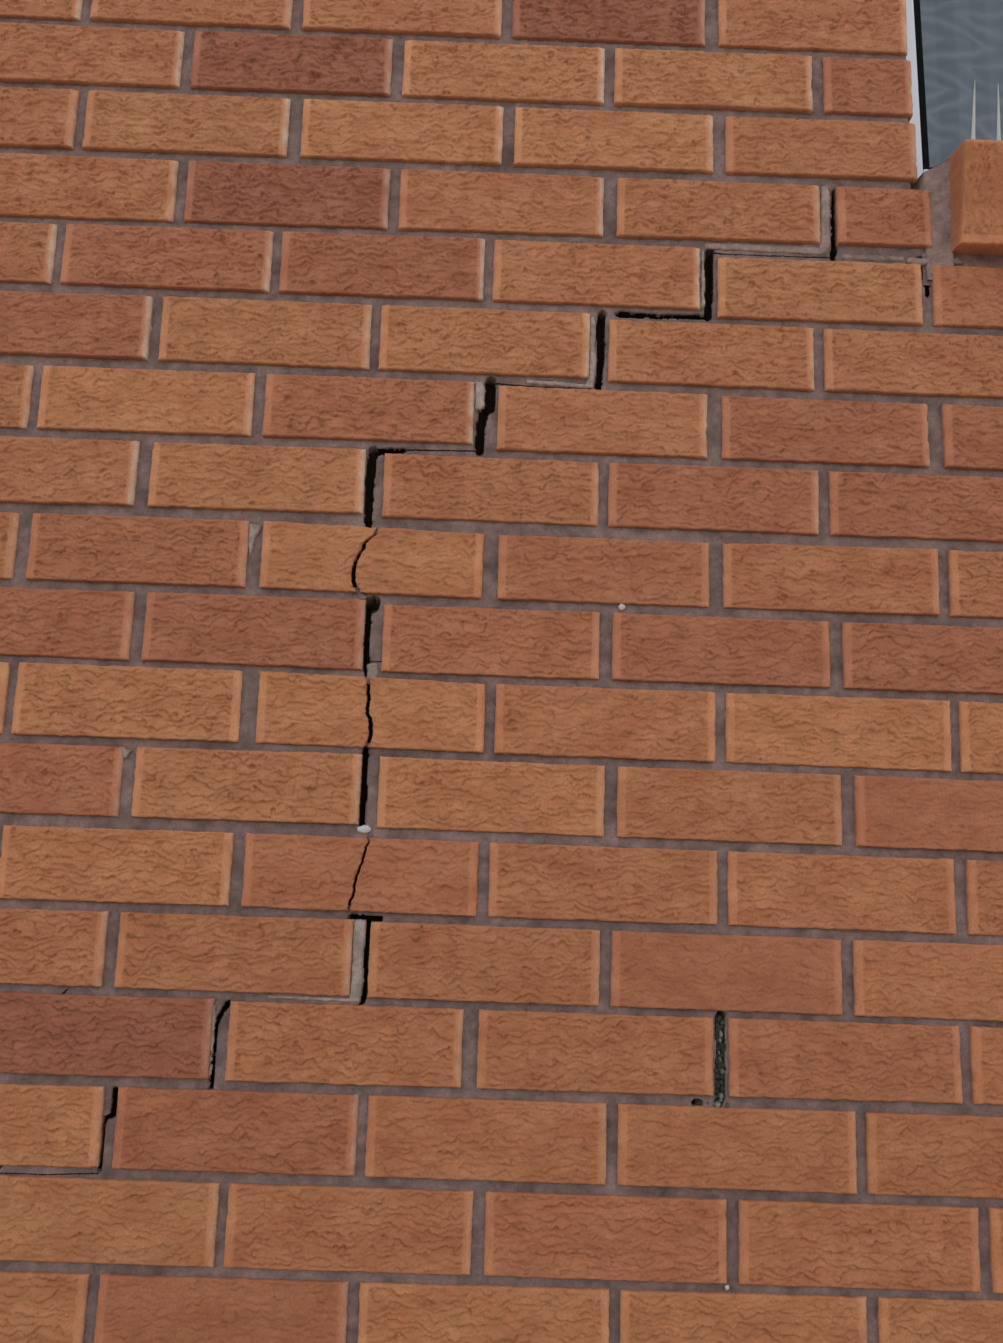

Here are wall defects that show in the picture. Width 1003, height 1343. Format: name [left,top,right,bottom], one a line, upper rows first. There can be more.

crack [340,193,837,1005]
crack [208,1000,231,1089]
crack [0,1087,118,1175]